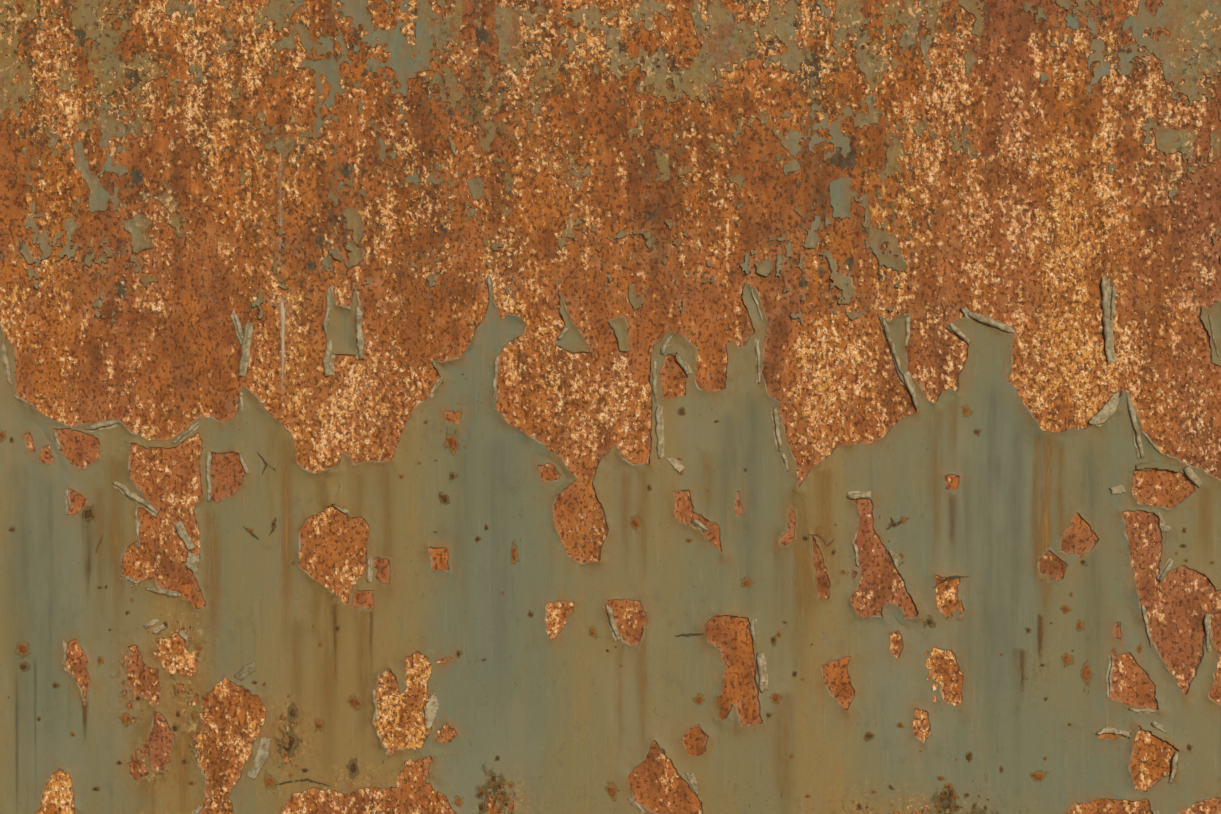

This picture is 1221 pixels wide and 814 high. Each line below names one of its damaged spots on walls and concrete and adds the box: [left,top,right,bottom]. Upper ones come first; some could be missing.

rust [0,0,1221,572]
peeling [113,433,249,610]
peeling [120,619,297,814]
rust [263,694,309,793]
peeling [299,504,390,609]
peeling [280,652,458,814]
rust [454,755,514,814]
rust [931,776,989,814]
rust [1024,592,1084,667]
rust [1061,649,1093,694]
peeling [1066,623,1179,814]
peeling [1110,460,1221,705]